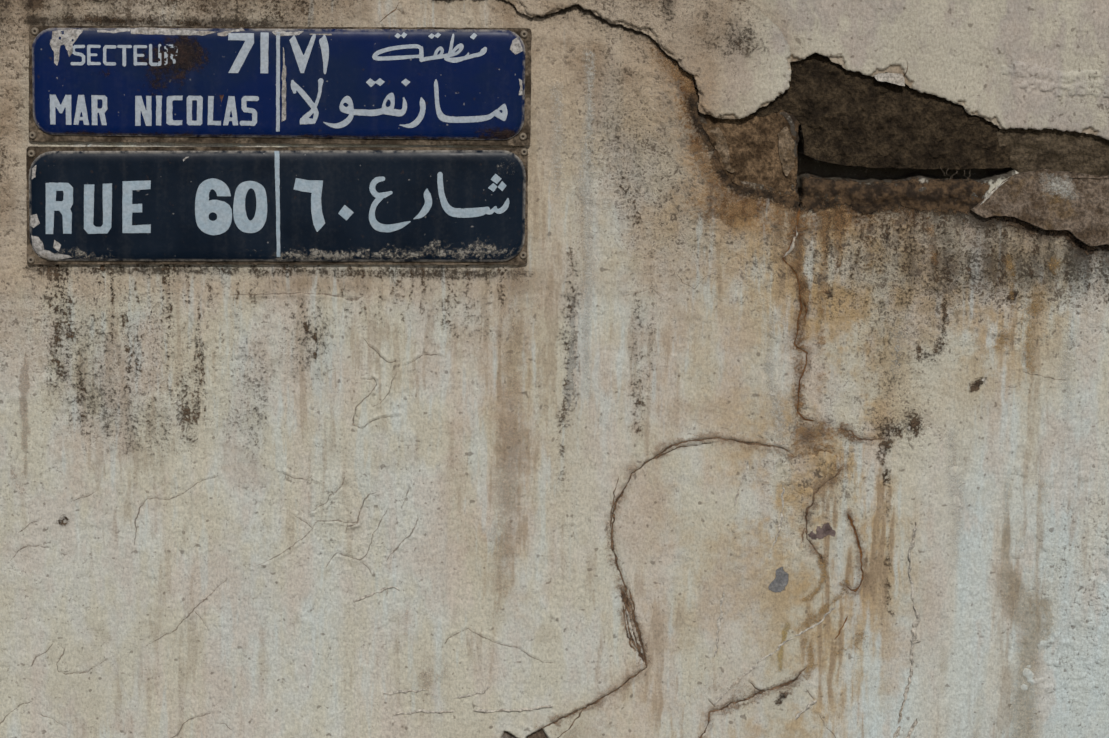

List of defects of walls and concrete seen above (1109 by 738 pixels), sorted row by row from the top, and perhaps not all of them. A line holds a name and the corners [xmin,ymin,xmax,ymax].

leakage [62,0,212,26]
spalling [687,53,1109,246]
leakage [40,264,85,401]
leakage [91,265,144,393]
leakage [167,295,206,442]
leakage [916,251,971,361]
leakage [979,216,1109,286]
leakage [874,409,924,483]
crack [541,437,790,738]
rust [803,557,827,601]
spalling [502,729,547,738]
crack [700,668,806,738]